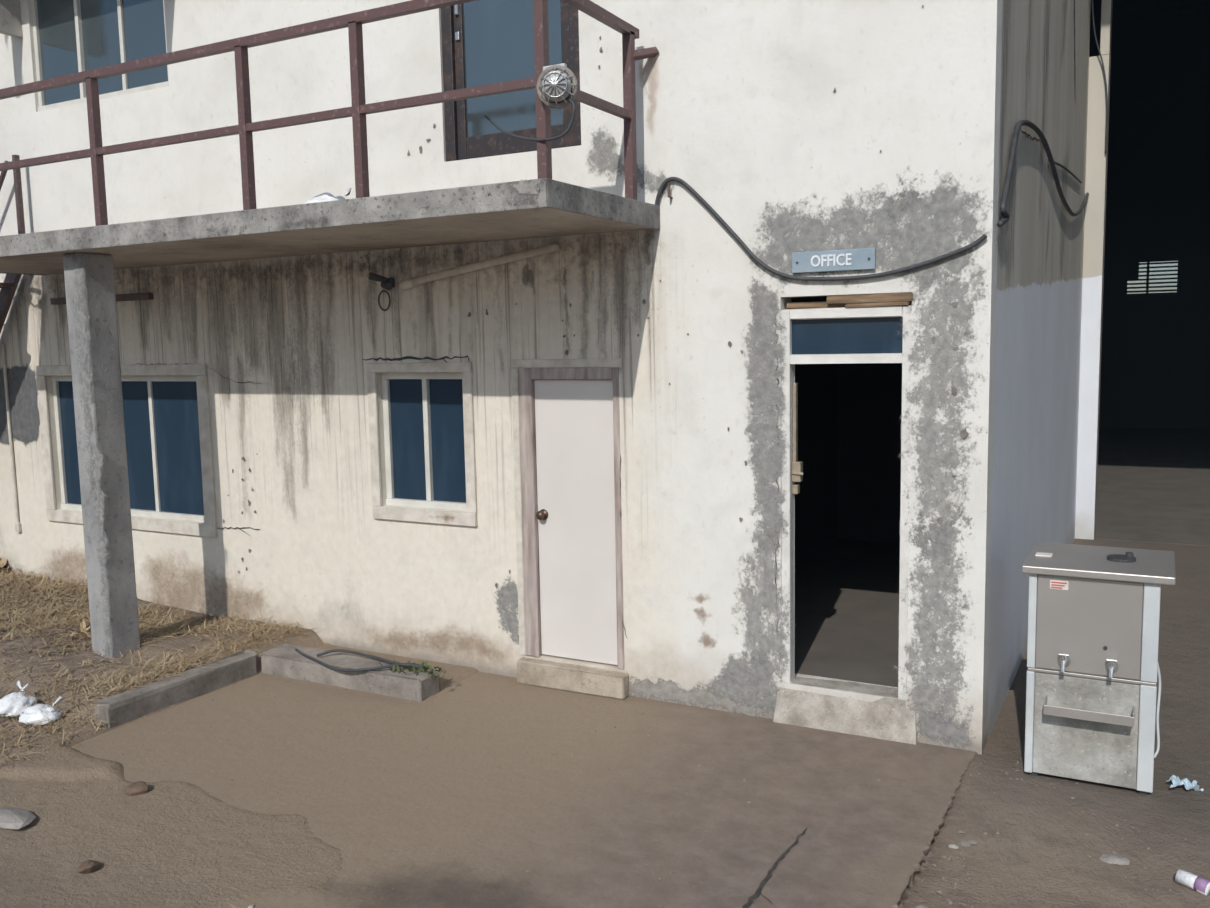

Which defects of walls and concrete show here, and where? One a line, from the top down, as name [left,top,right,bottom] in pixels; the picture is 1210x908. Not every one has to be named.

crack [362,355,469,363]
damp [55,252,111,655]
peeling [896,271,985,748]
damp [152,565,259,614]
flaking render [495,570,519,644]